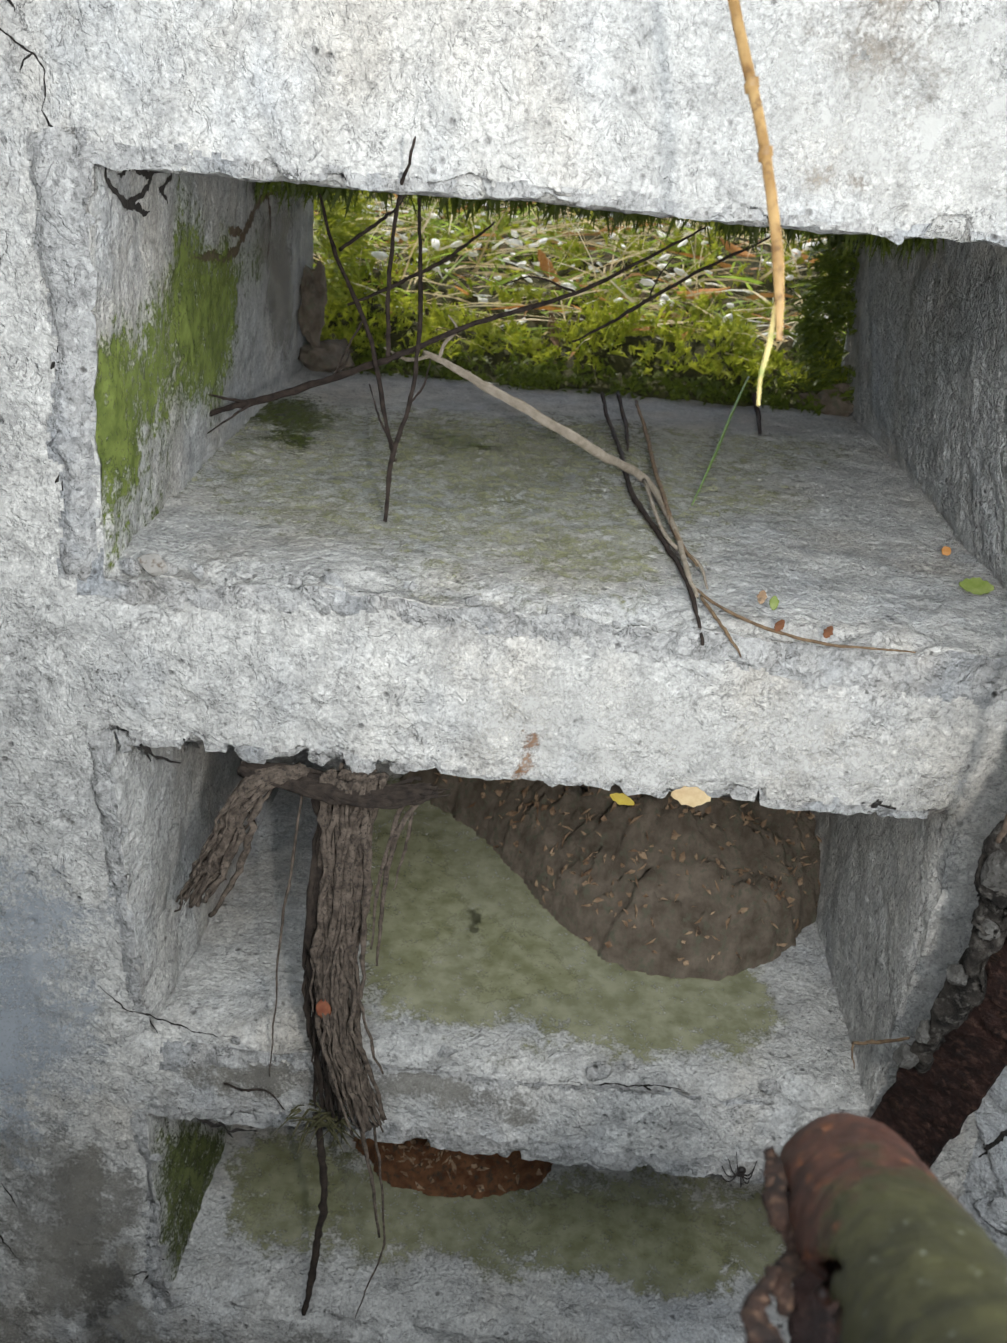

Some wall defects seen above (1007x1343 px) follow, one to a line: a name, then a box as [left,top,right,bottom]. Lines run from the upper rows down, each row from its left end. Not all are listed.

crack [0,0,54,127]
damp [169,249,229,405]
damp [95,308,142,498]
damp [166,1124,223,1232]
crack [978,1130,1007,1158]